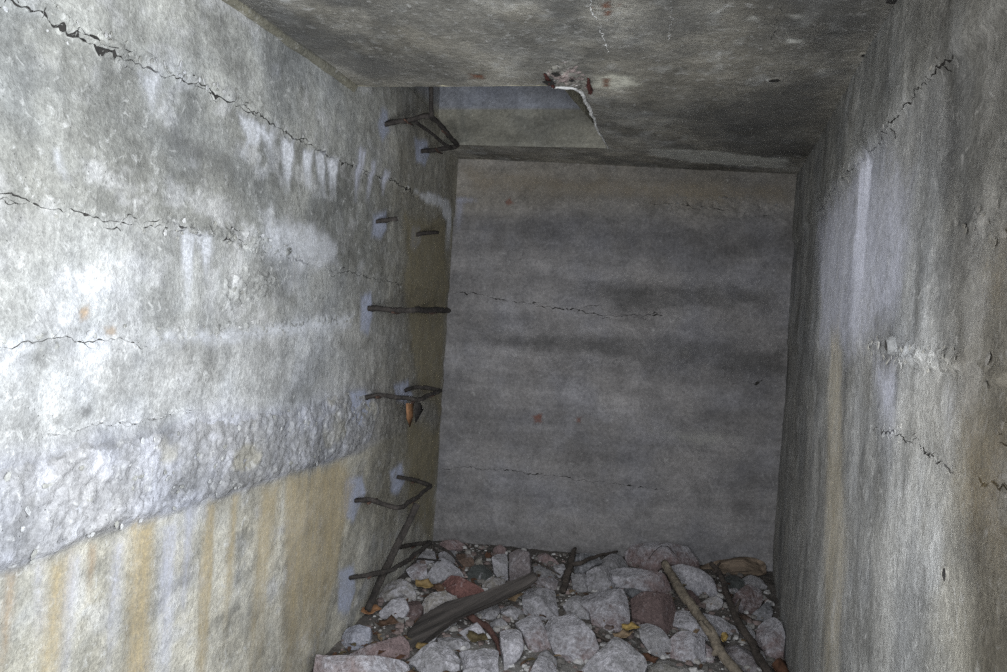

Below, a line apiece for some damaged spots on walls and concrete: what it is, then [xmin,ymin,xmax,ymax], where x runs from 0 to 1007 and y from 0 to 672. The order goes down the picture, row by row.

crack [0,0,414,193]
spalling [542,61,609,149]
crack [817,55,954,215]
crack [0,192,663,321]
crack [1,330,147,351]
rust [406,401,423,427]
crack [873,423,954,474]
crack [978,471,1007,501]